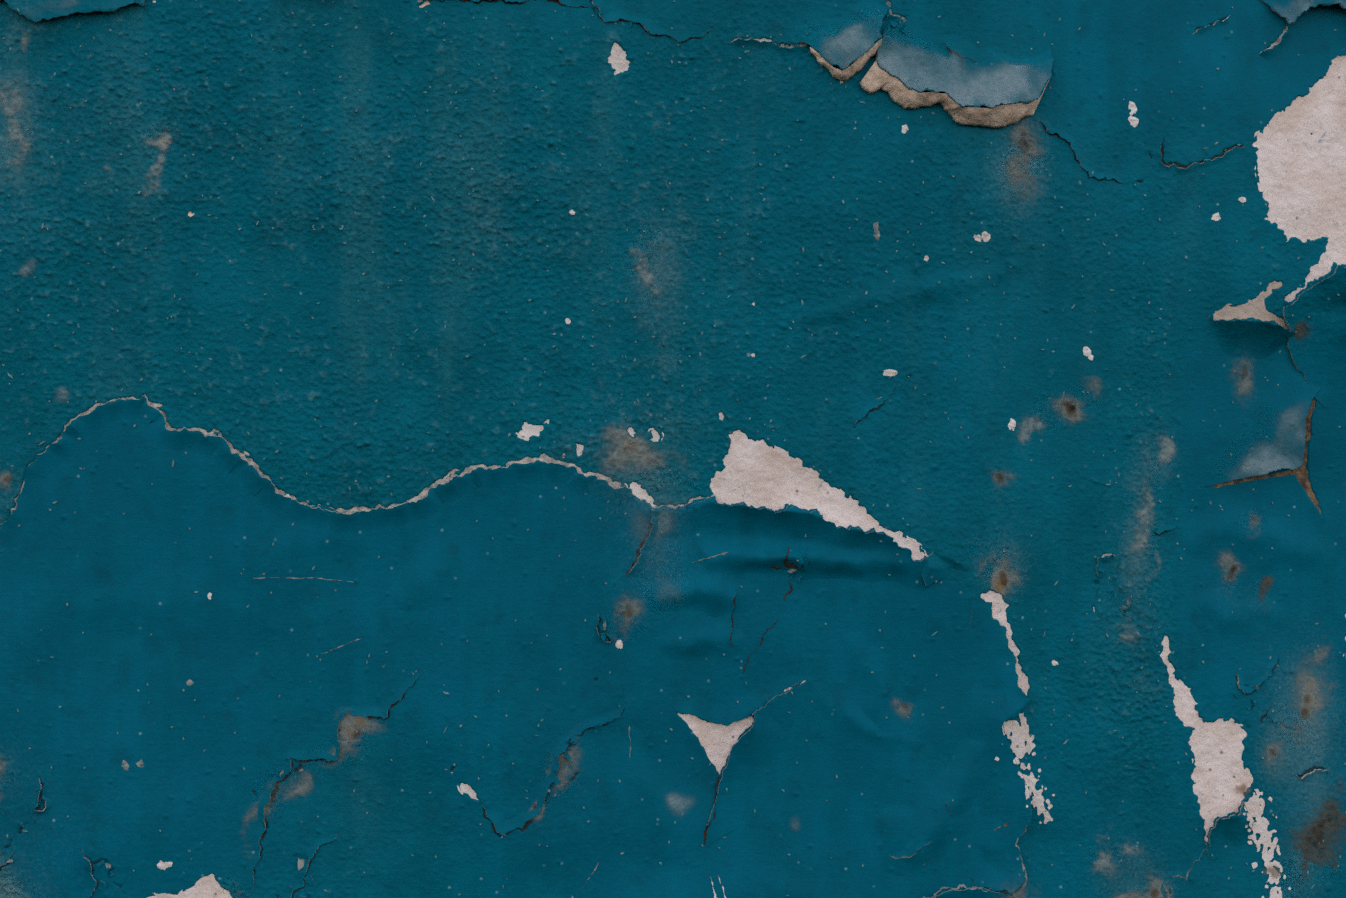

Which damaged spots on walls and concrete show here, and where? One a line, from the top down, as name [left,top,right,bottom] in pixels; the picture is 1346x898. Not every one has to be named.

crack [403,0,812,58]
peeling [1213,56,1346,329]
crack [0,395,718,580]
peeling [710,412,928,560]
crack [591,613,615,646]
peeling [981,591,1030,696]
crack [241,669,426,898]
crack [481,703,626,837]
peeling [678,713,754,774]
peeling [1159,635,1253,845]
peeling [147,874,232,898]
crack [922,825,1027,898]